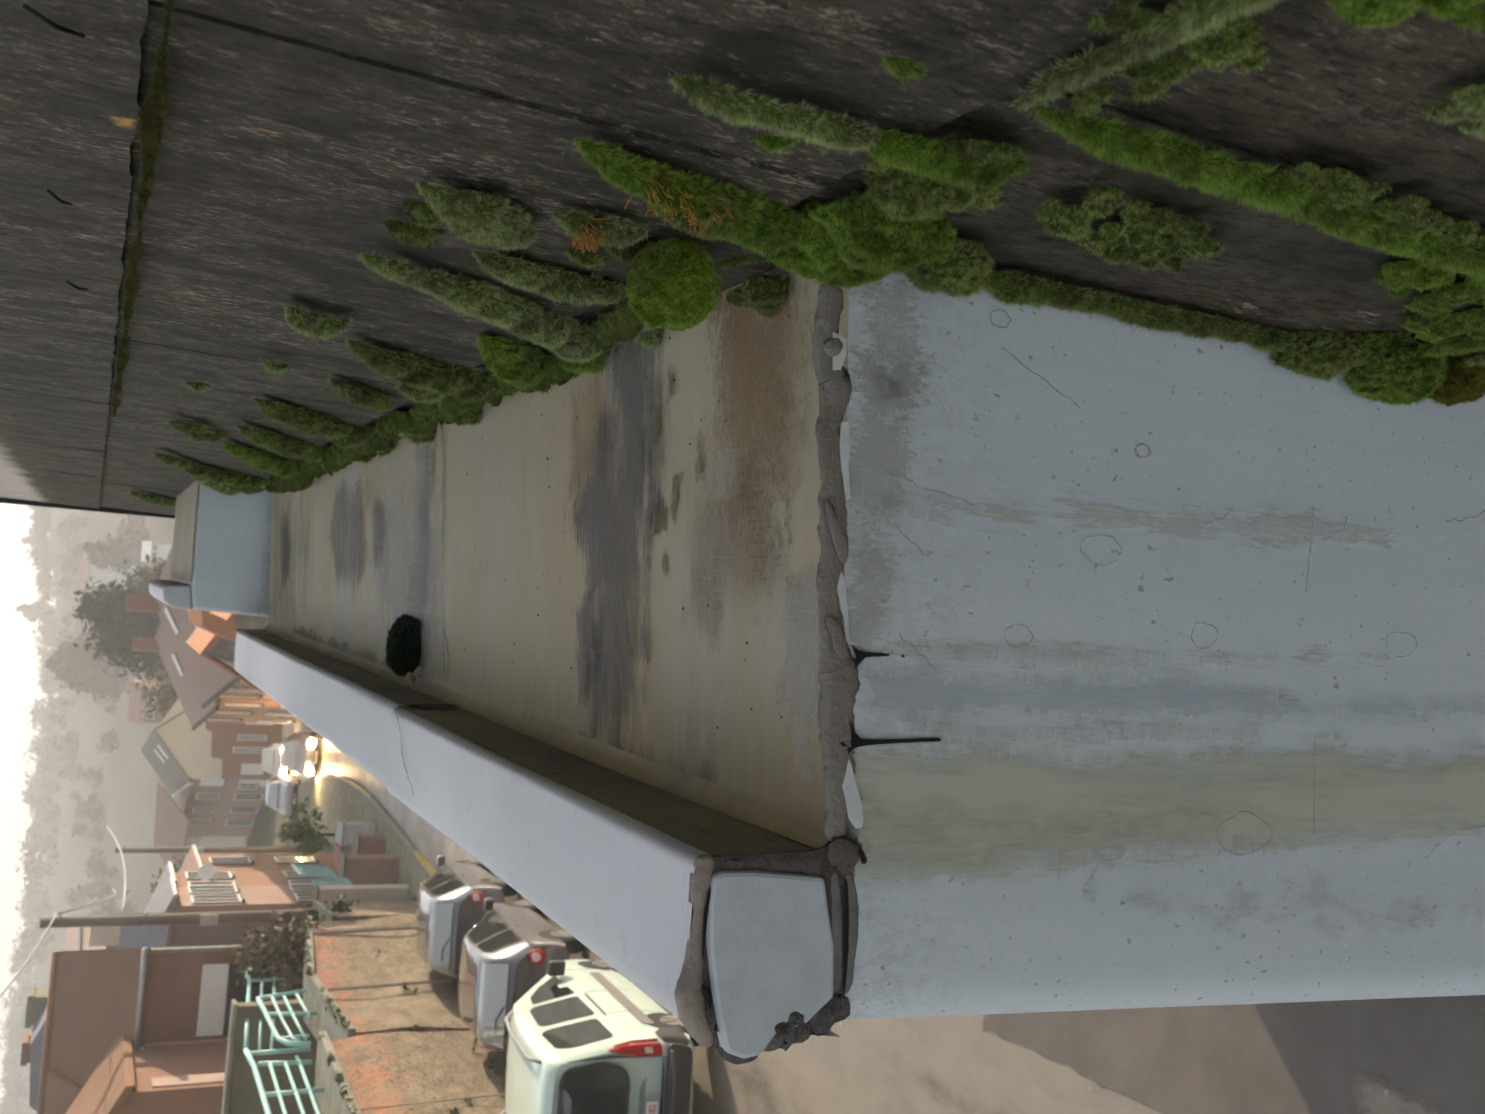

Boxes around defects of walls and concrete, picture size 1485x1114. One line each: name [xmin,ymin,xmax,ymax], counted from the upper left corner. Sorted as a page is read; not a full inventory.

damp [280,514,291,590]
damp [574,329,668,744]